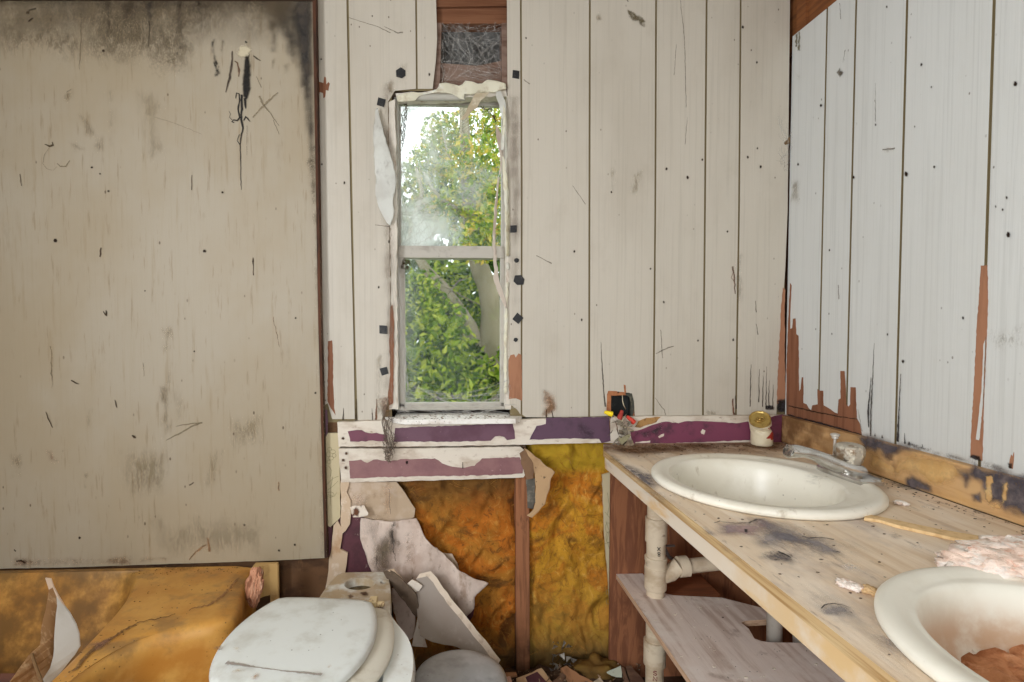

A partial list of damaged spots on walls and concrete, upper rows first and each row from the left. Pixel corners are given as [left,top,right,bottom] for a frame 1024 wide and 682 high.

damp [16,0,313,135]
peeling [976,339,986,440]
peeling [348,424,515,442]
peeling [530,417,611,443]
peeling [630,413,751,443]
peeling [770,400,785,443]
peeling [349,457,523,479]
damp [900,477,930,491]
damp [949,455,1024,514]